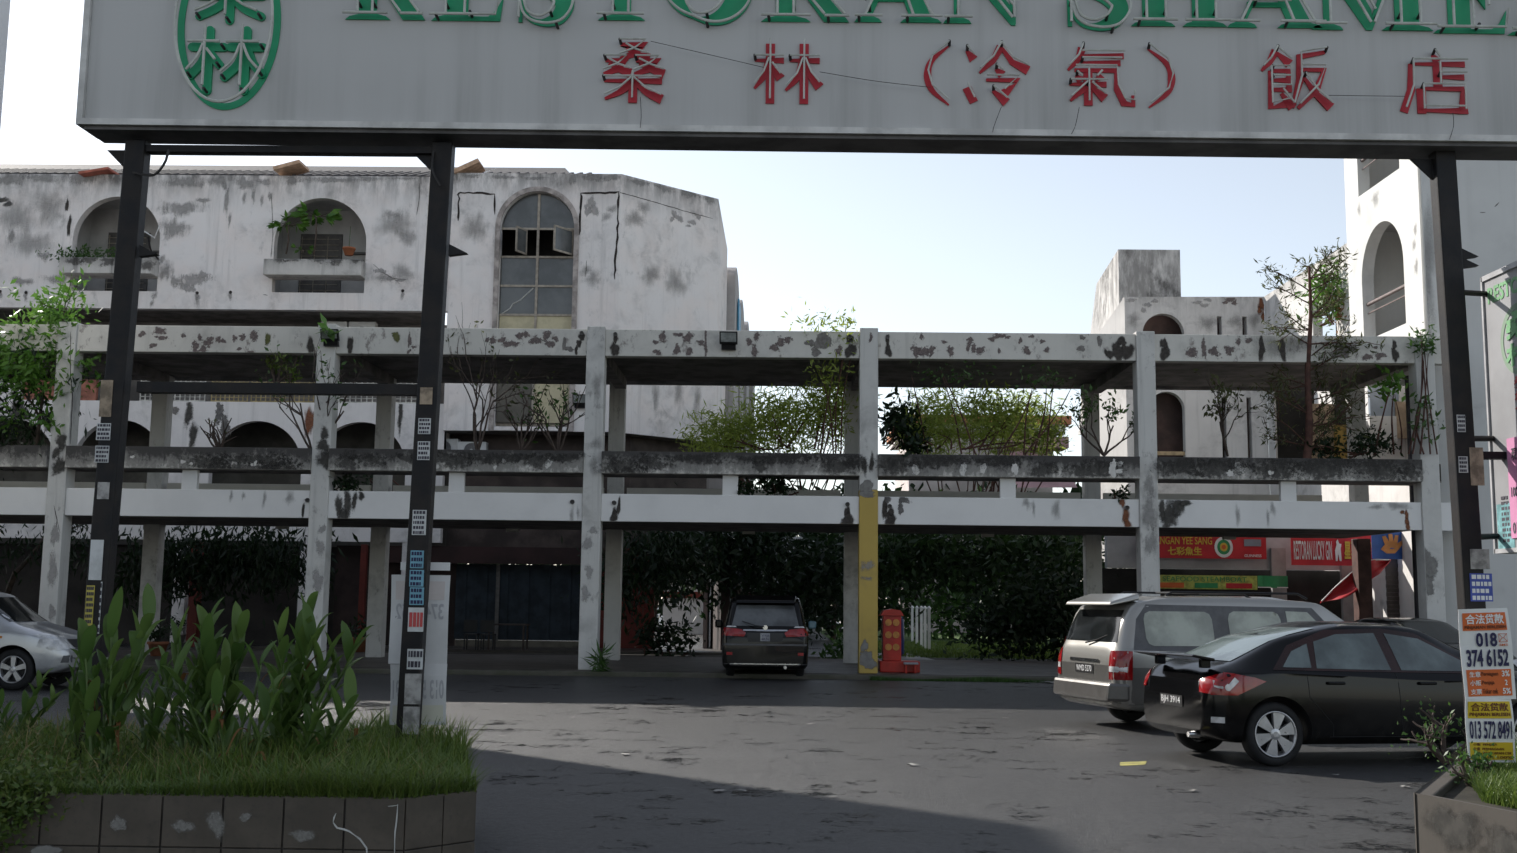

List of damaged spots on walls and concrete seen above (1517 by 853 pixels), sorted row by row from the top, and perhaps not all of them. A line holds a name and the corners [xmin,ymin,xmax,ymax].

water stain [163,177,272,237]
water stain [569,175,713,215]
peeling [485,330,574,352]
peeling [652,330,708,357]
peeling [746,331,842,357]
peeling [910,332,1050,358]
peeling [1184,338,1252,359]
peeling [1327,346,1387,361]
water stain [437,451,1123,478]
water stain [840,506,854,524]
water stain [882,497,910,524]
water stain [1143,457,1421,552]